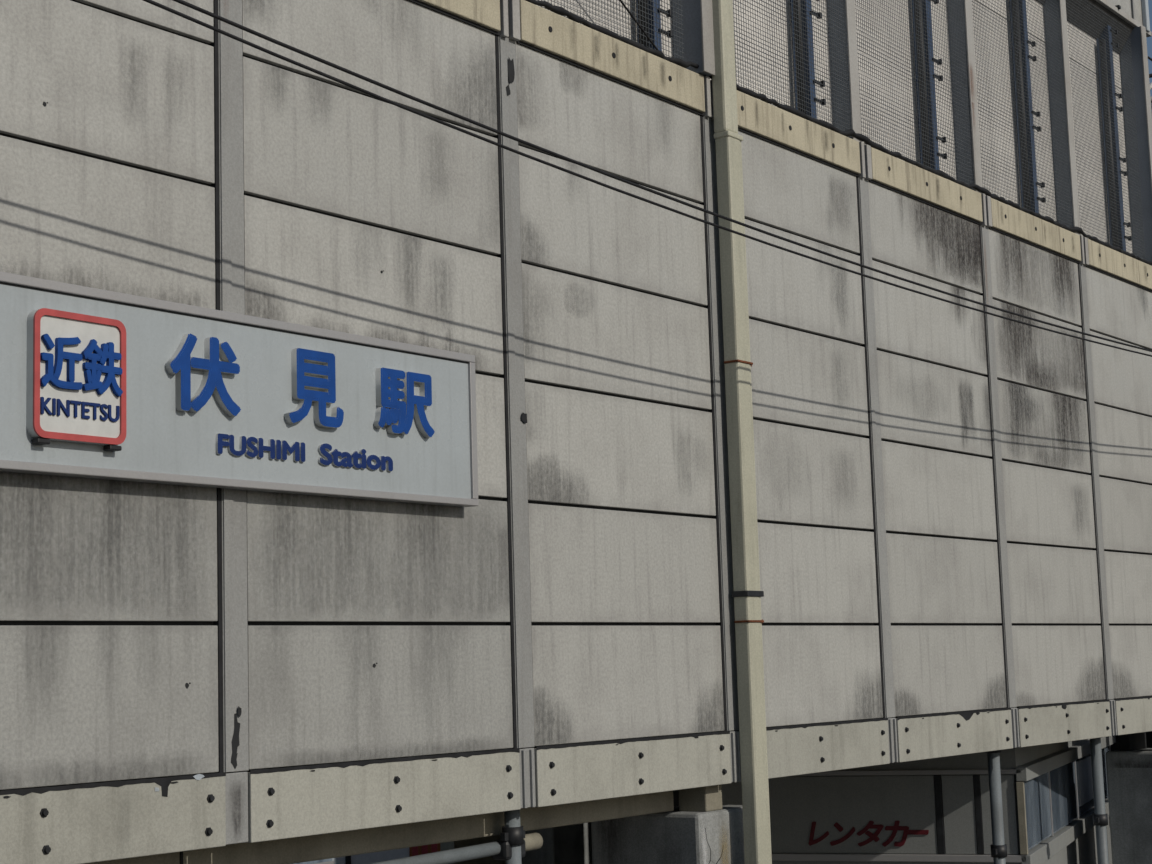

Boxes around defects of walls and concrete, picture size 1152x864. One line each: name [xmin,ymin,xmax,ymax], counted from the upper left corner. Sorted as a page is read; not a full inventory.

peeling [231,706,242,769]